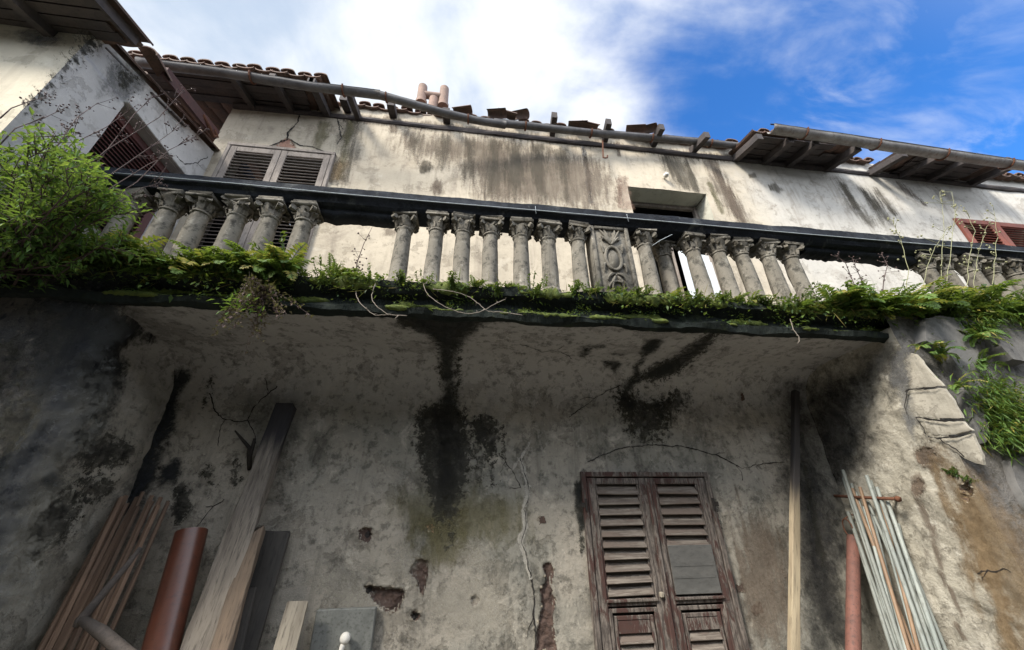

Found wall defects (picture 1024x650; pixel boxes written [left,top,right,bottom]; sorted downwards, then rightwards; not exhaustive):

crack [269,115,343,151]
damp [339,112,620,209]
damp [661,148,747,223]
damp [0,281,244,648]
crack [210,378,278,443]
damp [397,318,509,562]
crack [587,444,784,480]
flaking render [357,525,374,543]
flaking render [363,582,404,616]
flaking render [409,557,428,597]
crack [499,440,536,650]
flaking render [536,563,557,650]